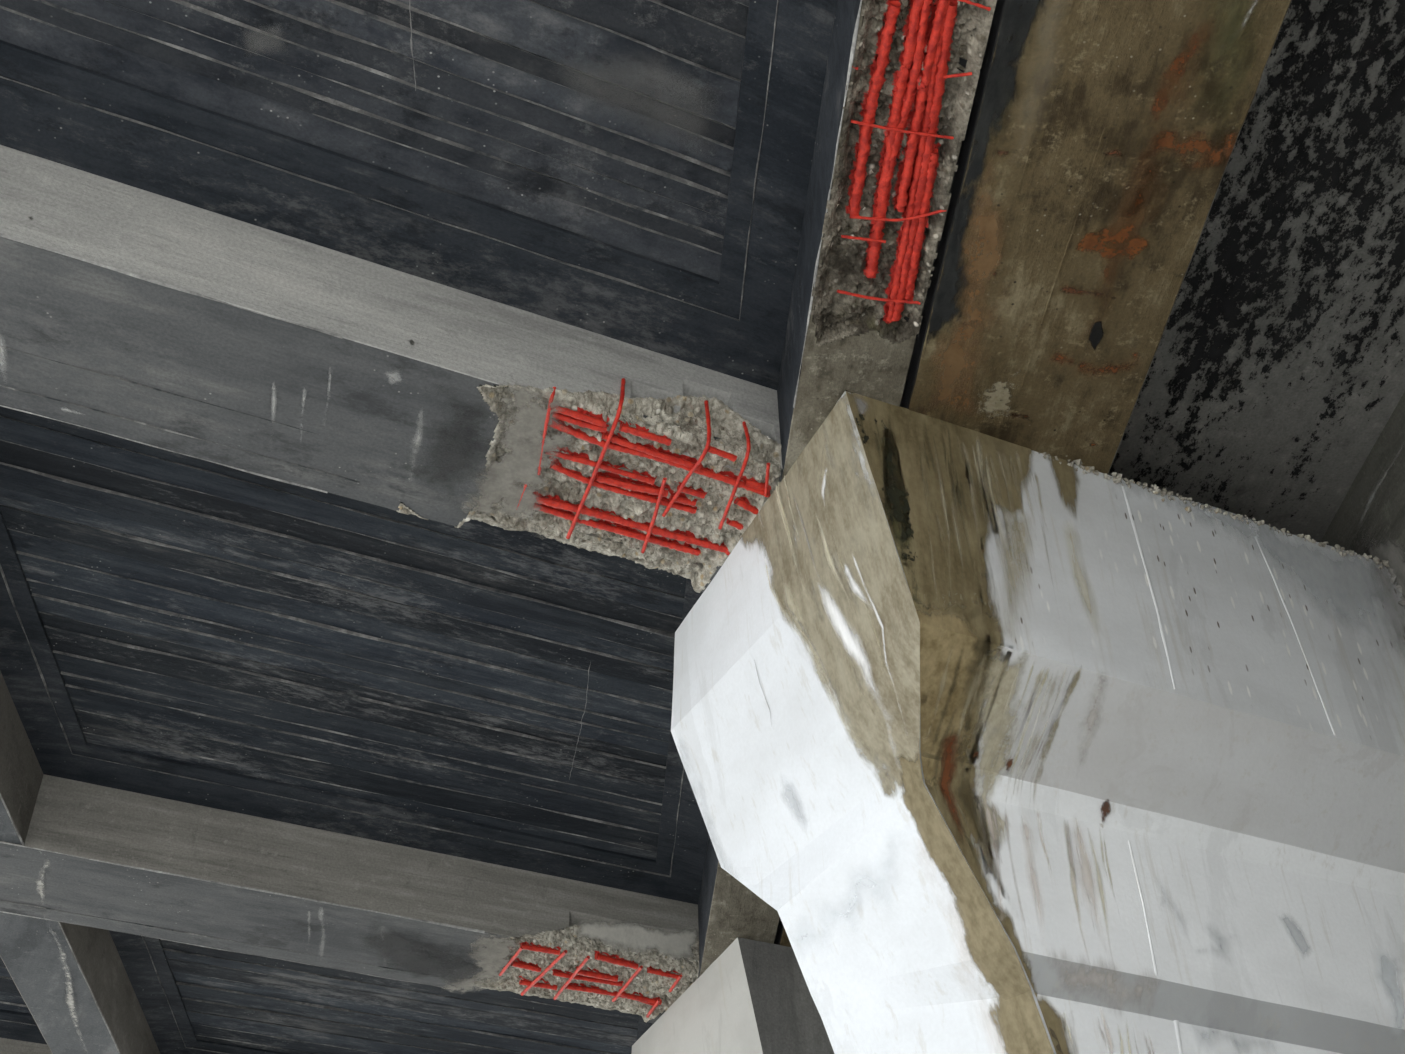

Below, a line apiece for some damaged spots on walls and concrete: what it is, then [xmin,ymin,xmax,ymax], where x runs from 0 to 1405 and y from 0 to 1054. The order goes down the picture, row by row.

crack [408,0,416,91]
spalling [811,0,997,346]
corrosion [1076,131,1237,277]
damp [1109,0,1405,521]
damp [978,374,1015,417]
spalling [397,503,428,520]
spalling [455,378,784,593]
damp [1050,455,1078,513]
damp [741,390,1072,1054]
damp [1069,838,1111,907]
spalling [443,924,700,1023]